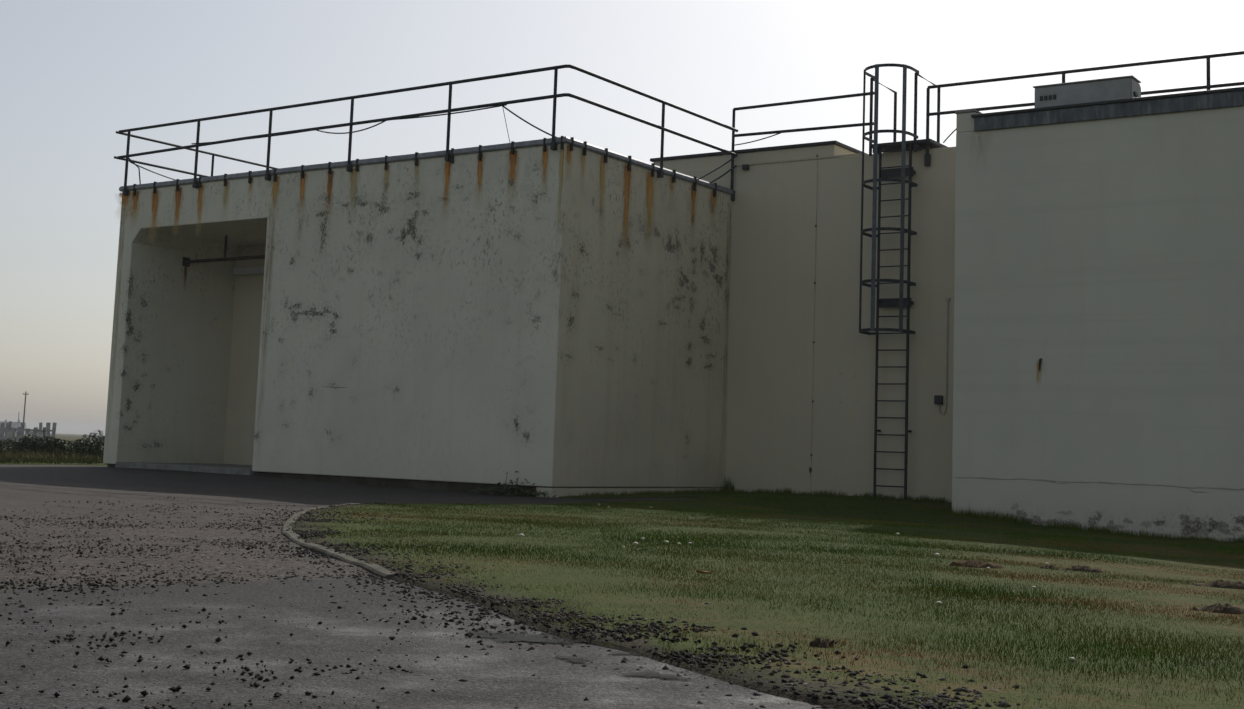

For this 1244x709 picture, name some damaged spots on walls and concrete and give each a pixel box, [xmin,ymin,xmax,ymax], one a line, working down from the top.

crack [957,477,1244,493]